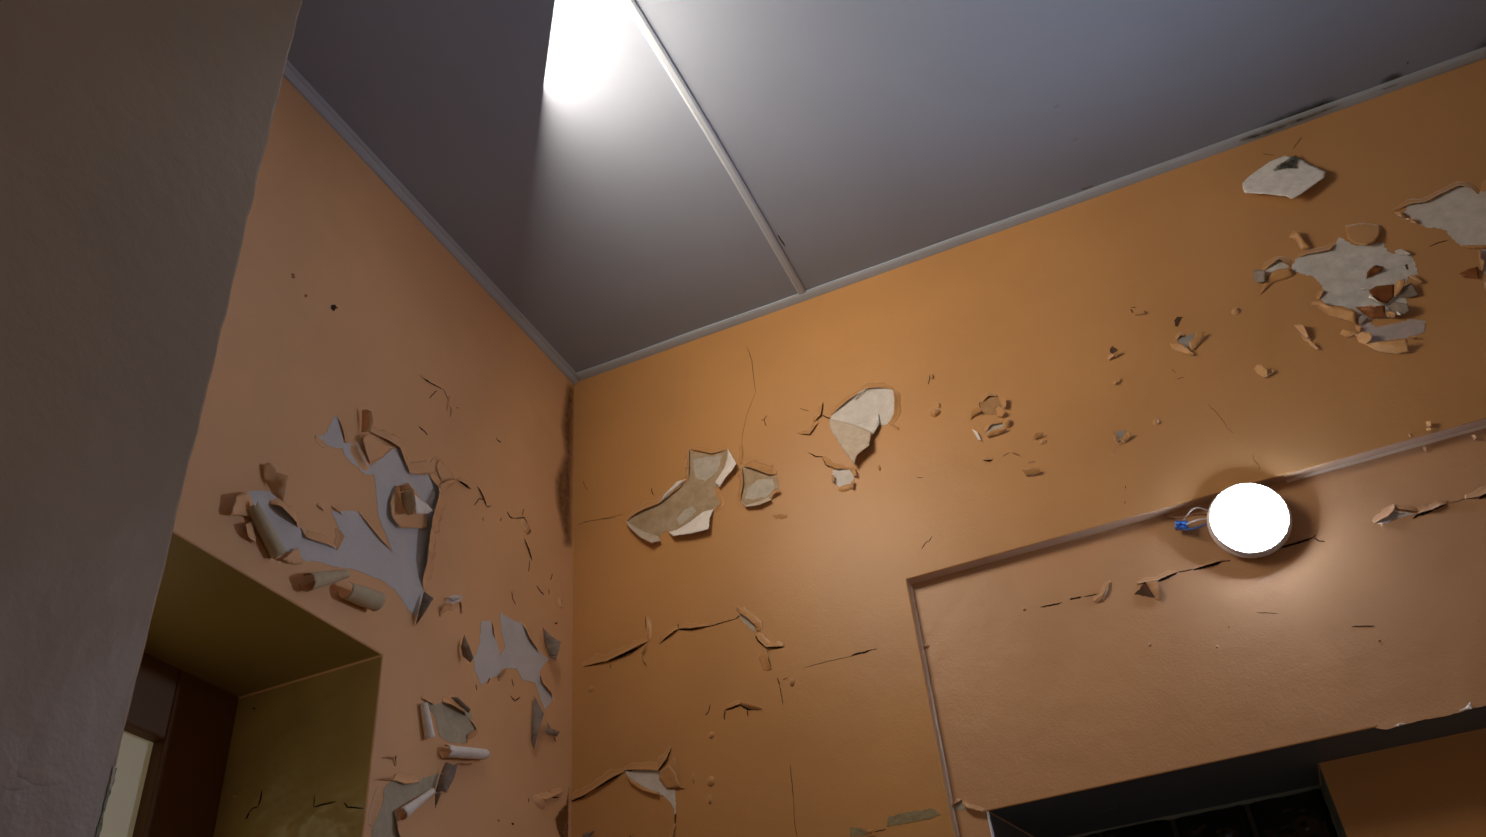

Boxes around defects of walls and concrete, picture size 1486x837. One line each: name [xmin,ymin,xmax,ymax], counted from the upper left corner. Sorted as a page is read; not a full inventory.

peeling [1242,155,1326,199]
peeling [1253,223,1427,354]
peeling [1393,180,1486,289]
peeling [810,382,901,492]
peeling [231,409,562,748]
peeling [625,443,788,543]
crack [1023,558,1231,611]
crack [1281,535,1325,548]
crack [583,605,875,720]
peeling [368,694,490,837]
crack [571,746,684,837]